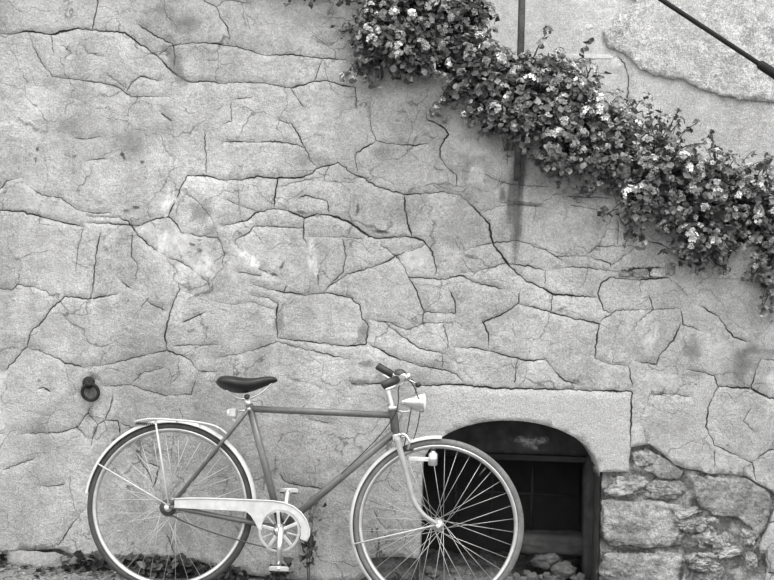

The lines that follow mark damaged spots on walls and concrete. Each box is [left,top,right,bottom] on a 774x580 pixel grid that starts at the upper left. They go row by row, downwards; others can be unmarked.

crack [0,0,698,447]
crack [701,306,746,342]
crack [686,359,774,483]